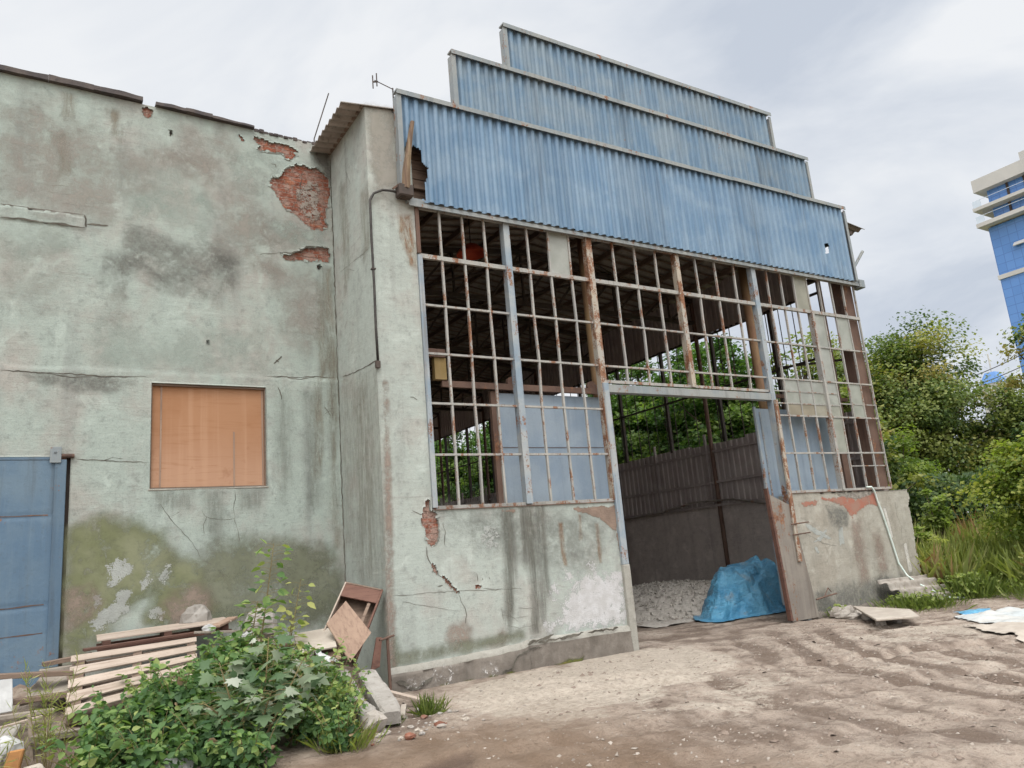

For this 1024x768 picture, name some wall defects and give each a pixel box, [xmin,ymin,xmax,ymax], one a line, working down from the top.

flaking render [239,135,331,231]
flaking render [281,246,330,263]
crack [7,370,149,378]
water stain [68,556,172,632]
water stain [147,588,208,624]
crack [162,495,240,583]
flaking render [421,500,442,547]
crack [394,526,618,674]
water stain [480,505,626,633]